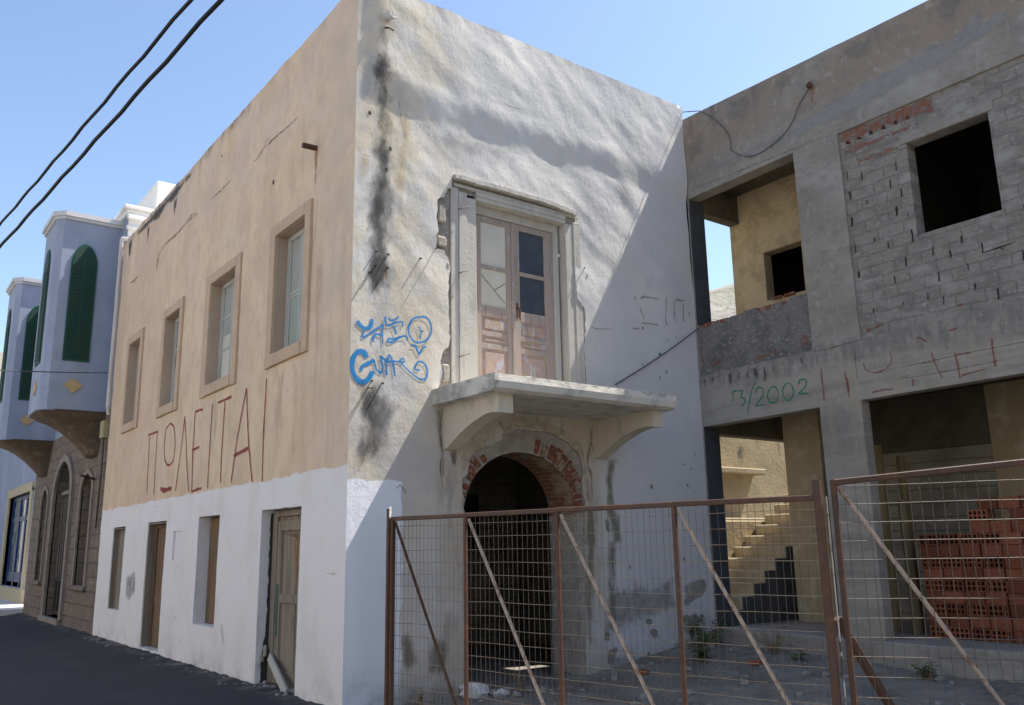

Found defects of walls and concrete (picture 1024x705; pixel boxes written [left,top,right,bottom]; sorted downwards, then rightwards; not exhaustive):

damp [371,140,391,287]
spalling [436,181,552,388]
damp [364,391,391,451]